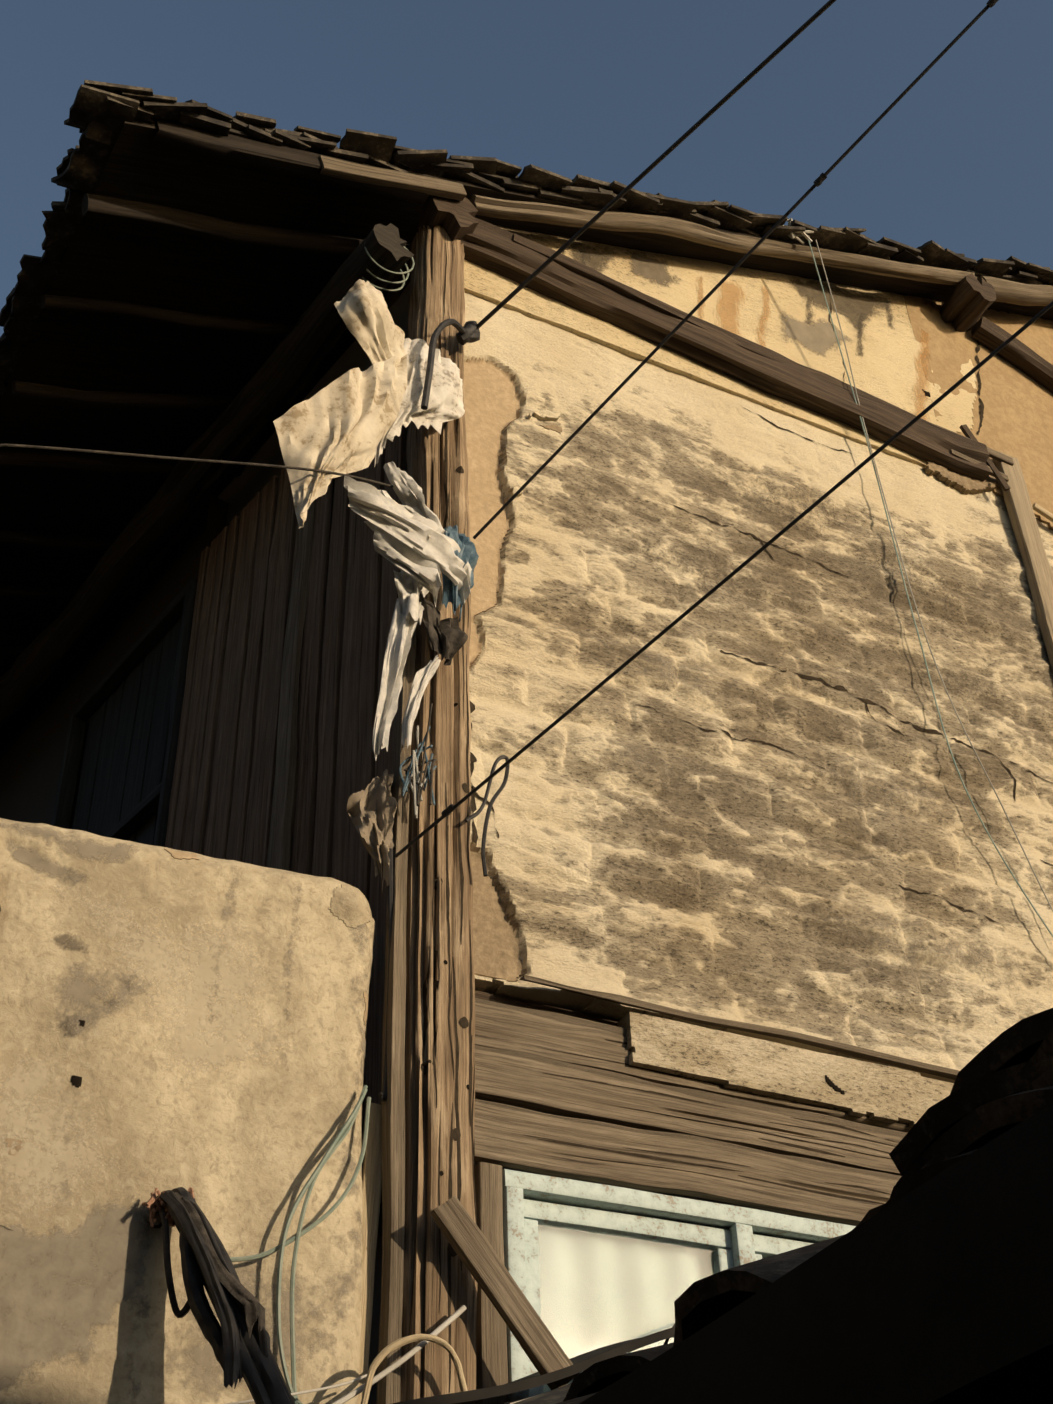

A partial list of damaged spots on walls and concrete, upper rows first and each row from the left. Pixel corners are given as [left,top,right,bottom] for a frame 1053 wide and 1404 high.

leakage [782,278,893,356]
flaking render [464,358,562,669]
crack [662,501,849,577]
crack [470,701,499,845]
crack [640,705,829,772]
crack [720,650,1052,801]
spalling [470,842,527,982]
crack [899,885,1049,941]
leakage [0,1060,97,1210]
leakage [0,1205,149,1390]